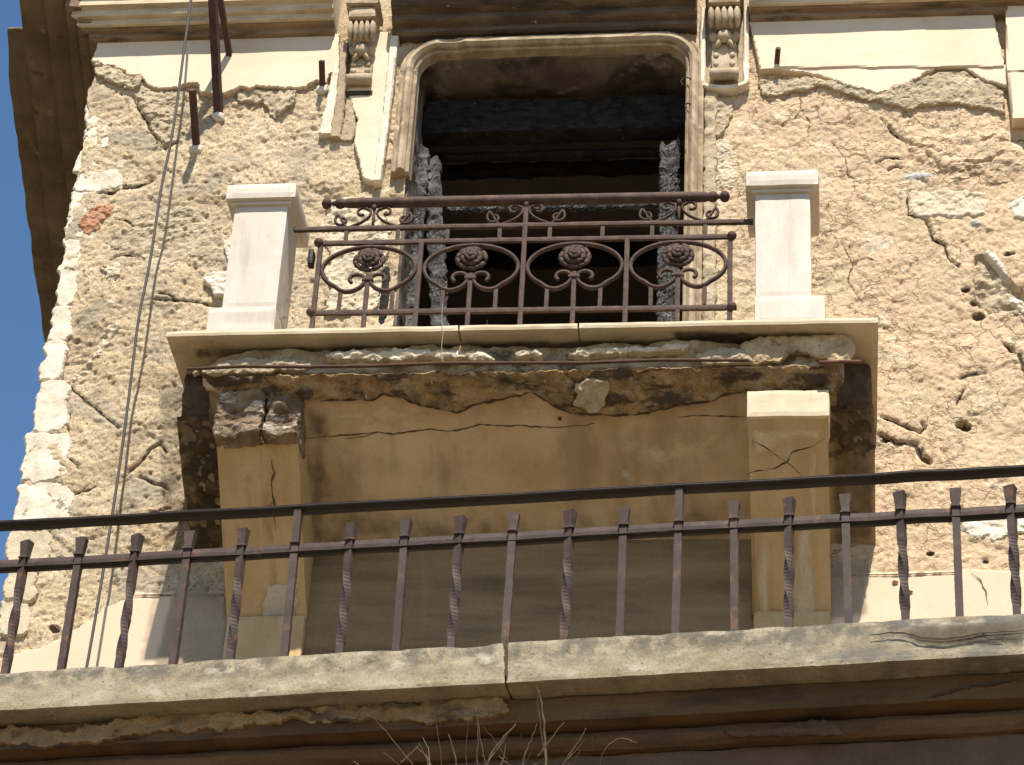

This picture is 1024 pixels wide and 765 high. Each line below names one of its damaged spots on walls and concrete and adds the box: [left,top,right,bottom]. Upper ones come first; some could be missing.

crack [134,99,179,145]
crack [834,120,902,183]
crack [906,194,958,267]
spalling [193,357,311,377]
spalling [326,347,495,365]
crack [307,369,744,439]
spalling [515,349,543,361]
spalling [568,334,855,378]
crack [956,373,982,404]
crack [1005,346,1024,372]
crack [831,411,924,461]
spalling [0,696,510,749]